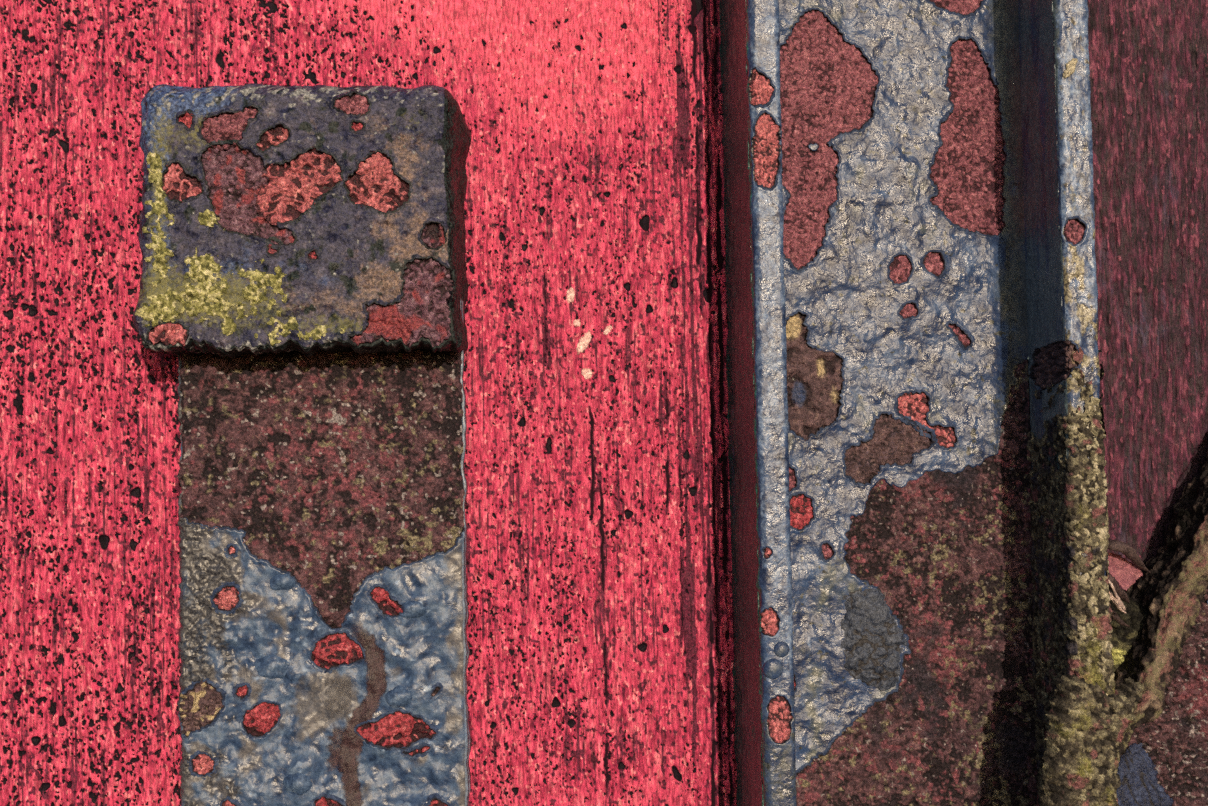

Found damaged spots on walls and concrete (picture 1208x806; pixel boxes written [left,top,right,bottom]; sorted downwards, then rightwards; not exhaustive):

peeling [926,0,986,20]
peeling [749,7,881,273]
peeling [928,35,1006,240]
peeling [161,103,414,264]
peeling [893,388,959,452]
peeling [789,463,816,531]
peeling [818,540,836,563]
peeling [209,581,244,616]
peeling [366,584,403,618]
peeling [309,628,366,674]
peeling [429,682,443,701]
peeling [354,708,439,758]